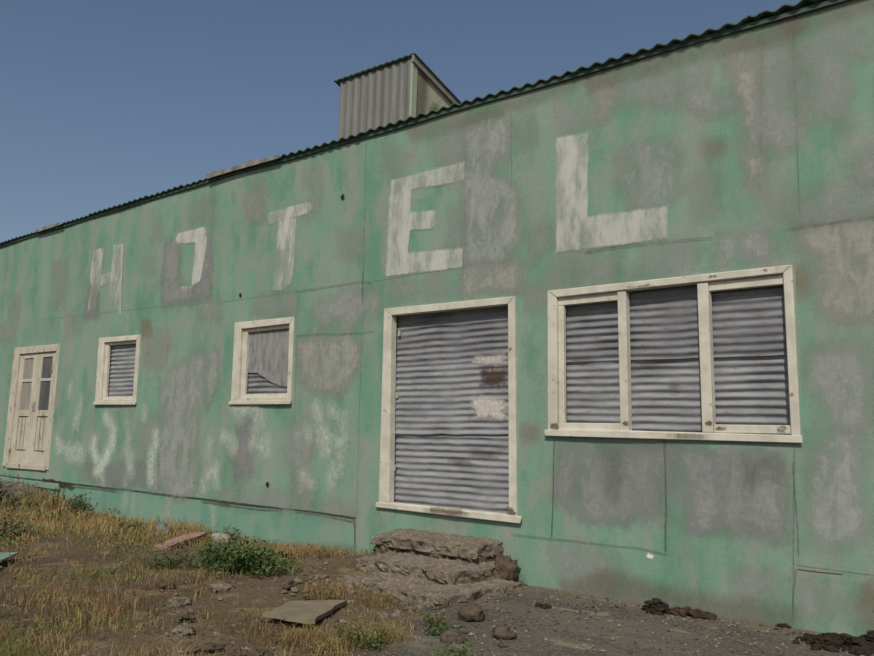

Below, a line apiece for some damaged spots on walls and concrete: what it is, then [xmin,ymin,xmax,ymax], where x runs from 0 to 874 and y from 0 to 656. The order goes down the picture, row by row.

peeling [458,116,521,296]
peeling [799,216,874,323]
peeling [298,330,360,395]
peeling [473,356,503,365]
peeling [472,397,506,419]
corrosion [481,368,506,385]
peeling [670,446,788,542]